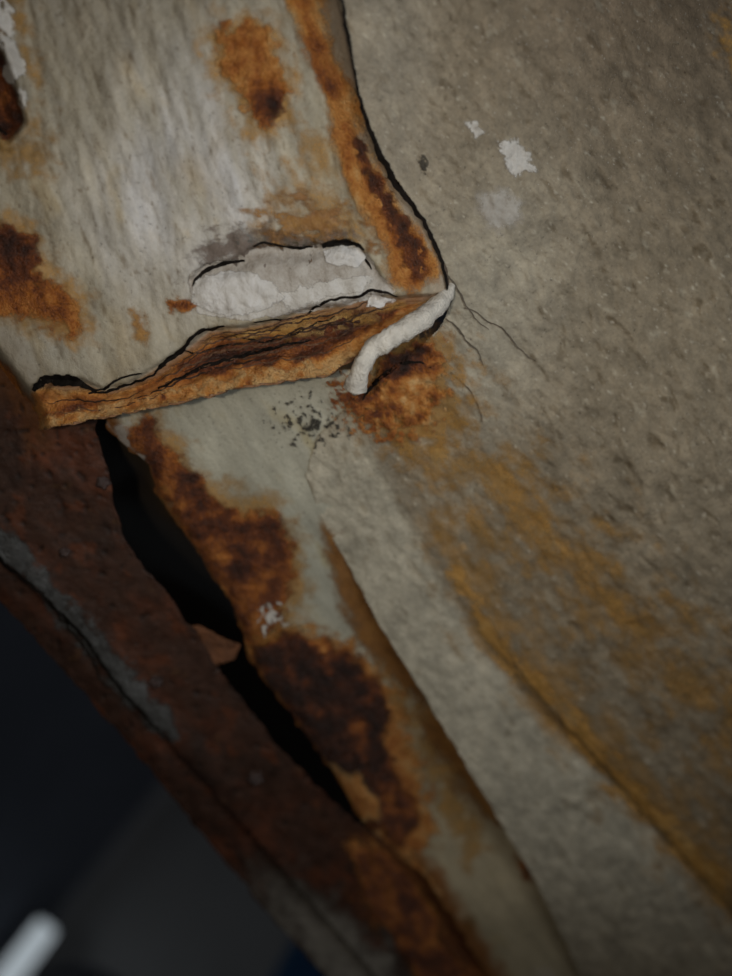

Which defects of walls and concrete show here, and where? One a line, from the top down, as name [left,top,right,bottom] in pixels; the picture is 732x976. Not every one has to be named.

spalling [0,0,44,177]
spalling [188,226,396,321]
crack [340,0,536,365]
rust [0,0,501,898]
crack [450,372,482,422]
crack [0,556,169,742]